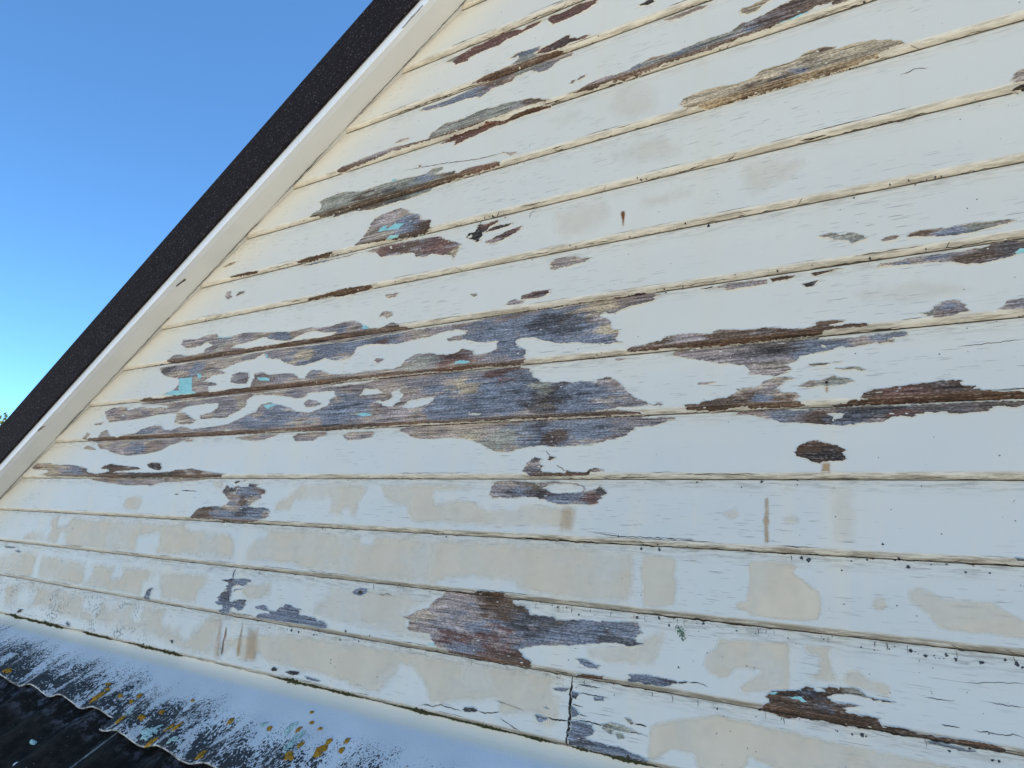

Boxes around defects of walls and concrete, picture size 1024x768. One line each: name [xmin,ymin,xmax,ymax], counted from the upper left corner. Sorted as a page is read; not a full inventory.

peeling [567,0,849,96]
peeling [678,39,906,111]
peeling [296,151,523,267]
peeling [816,219,1024,268]
peeling [31,289,1024,524]
peeling [214,578,328,629]
peeling [402,589,645,680]
crack [127,597,1024,756]
peeling [757,685,1007,754]